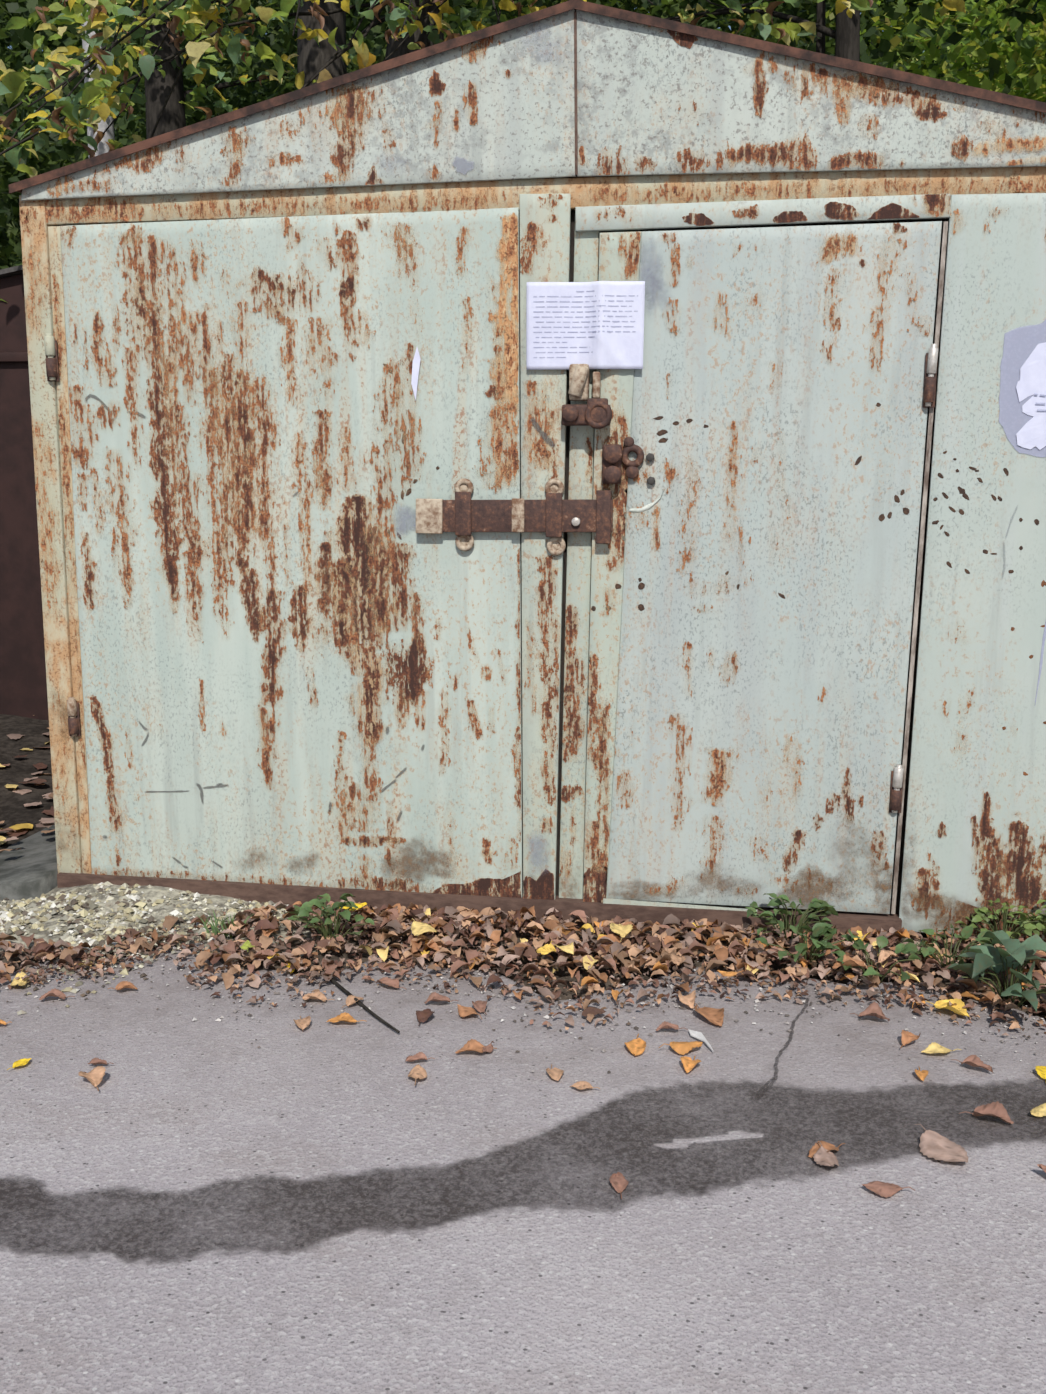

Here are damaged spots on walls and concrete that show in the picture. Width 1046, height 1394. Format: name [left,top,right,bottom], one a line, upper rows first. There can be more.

rust [461,36,501,63]
rust [648,26,698,48]
rust [20,51,1046,894]
rust [737,767,864,898]
crack [756,998,809,1100]
leakage [0,1080,1046,1261]